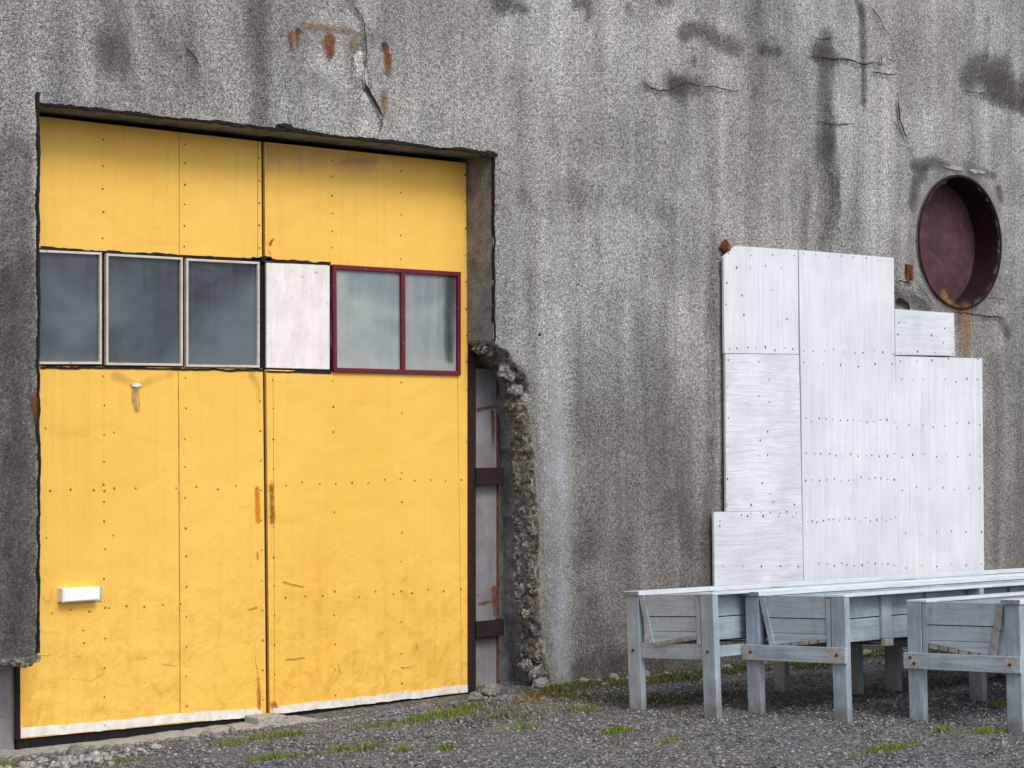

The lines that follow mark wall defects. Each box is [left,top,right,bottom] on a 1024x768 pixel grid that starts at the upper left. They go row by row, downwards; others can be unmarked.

rust [289,23,354,56]
crack [353,5,383,135]
rust [382,43,391,75]
crack [647,82,738,92]
crack [811,6,914,162]
leakage [961,55,1024,110]
leakage [813,29,843,237]
rust [942,291,975,353]
spalling [471,342,555,684]